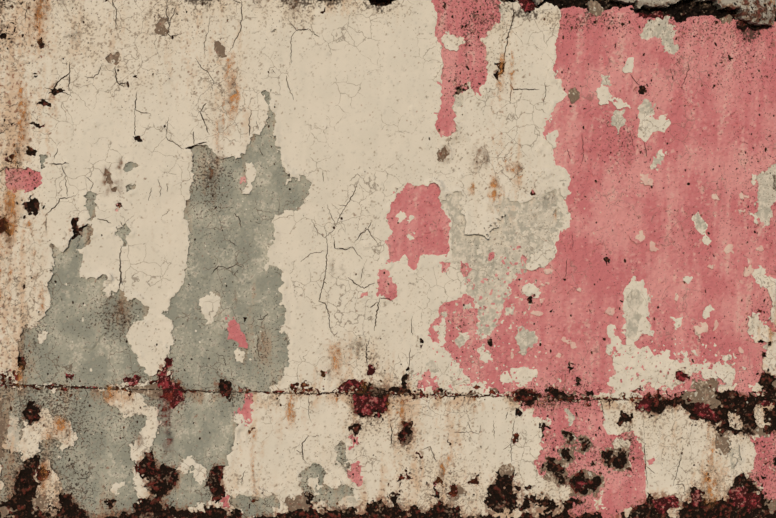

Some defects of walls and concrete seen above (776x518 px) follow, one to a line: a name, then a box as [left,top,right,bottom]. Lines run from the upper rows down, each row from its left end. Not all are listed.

crack [44,17,214,149]
crack [272,20,319,100]
crack [46,149,93,227]
crack [117,247,125,290]
peeling [0,87,631,518]
crack [303,174,390,362]
peeling [605,276,654,355]
peeling [692,212,711,246]
peeling [735,163,776,228]
corrosion [0,368,131,400]
corrosion [238,387,320,421]
spalling [616,370,776,518]